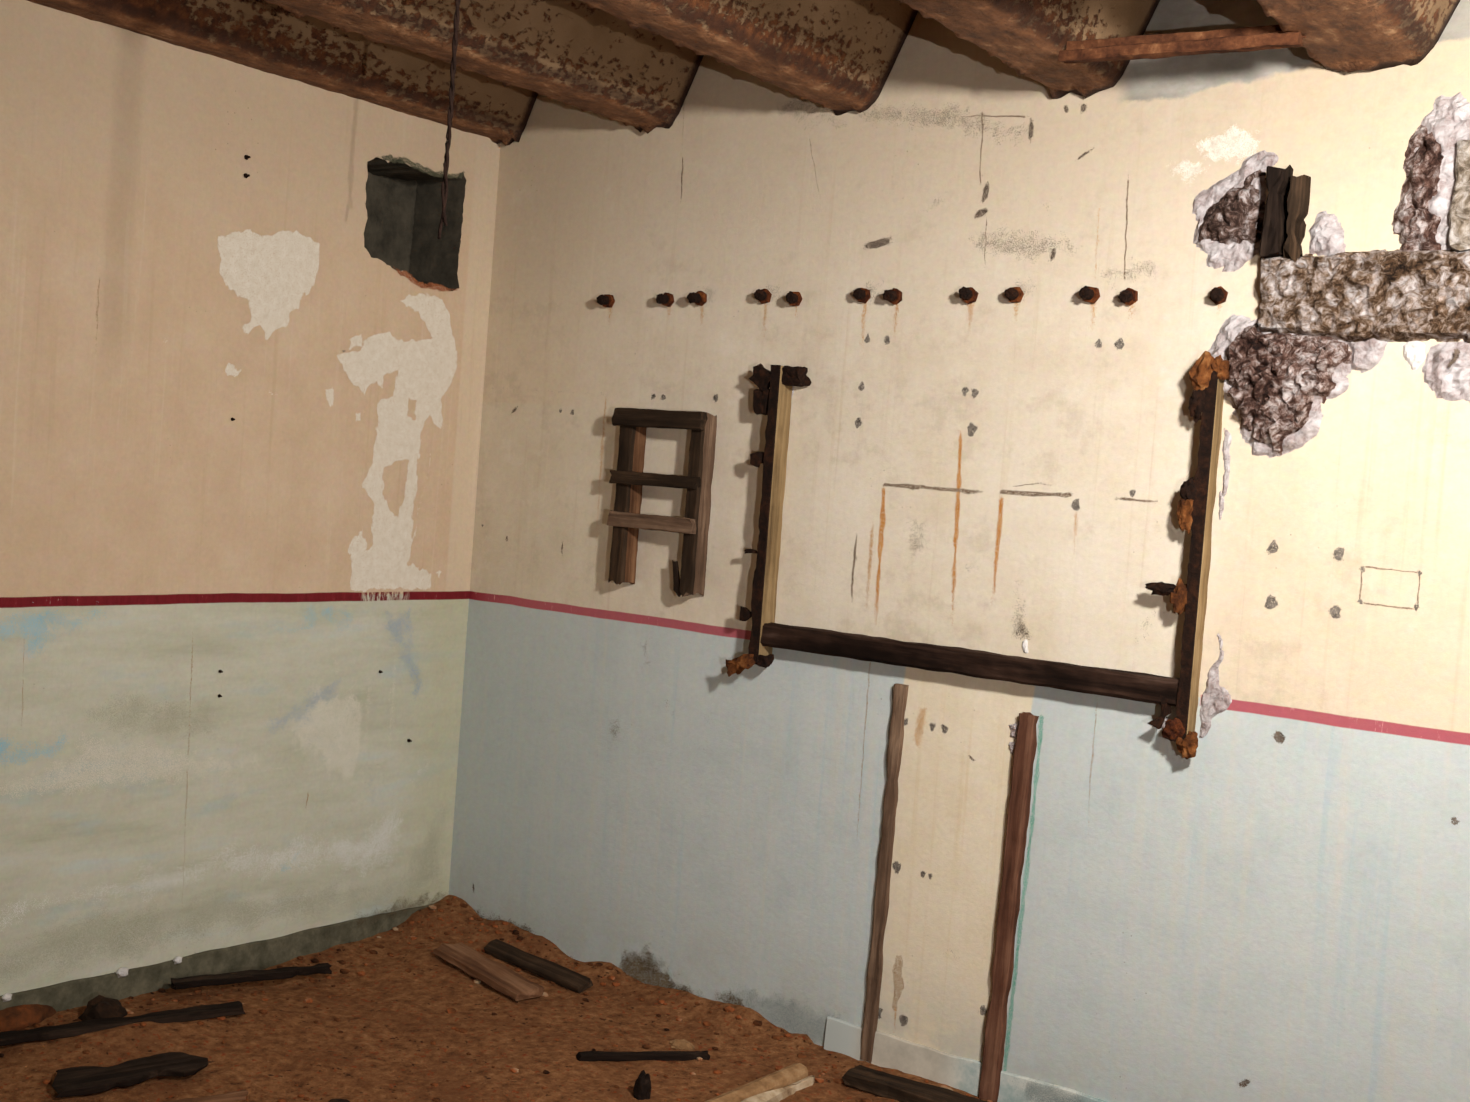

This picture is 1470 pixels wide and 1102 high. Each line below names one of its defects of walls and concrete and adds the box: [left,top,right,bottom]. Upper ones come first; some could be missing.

peeling [217,229,320,340]
flaking render [1166,124,1279,272]
flaking render [1308,211,1346,256]
flaking render [1391,92,1470,252]
peeling [337,154,466,593]
flaking render [1208,314,1470,520]
rust [865,489,886,624]
rust [950,430,963,624]
rust [991,495,1004,598]
flaking render [1199,633,1232,738]